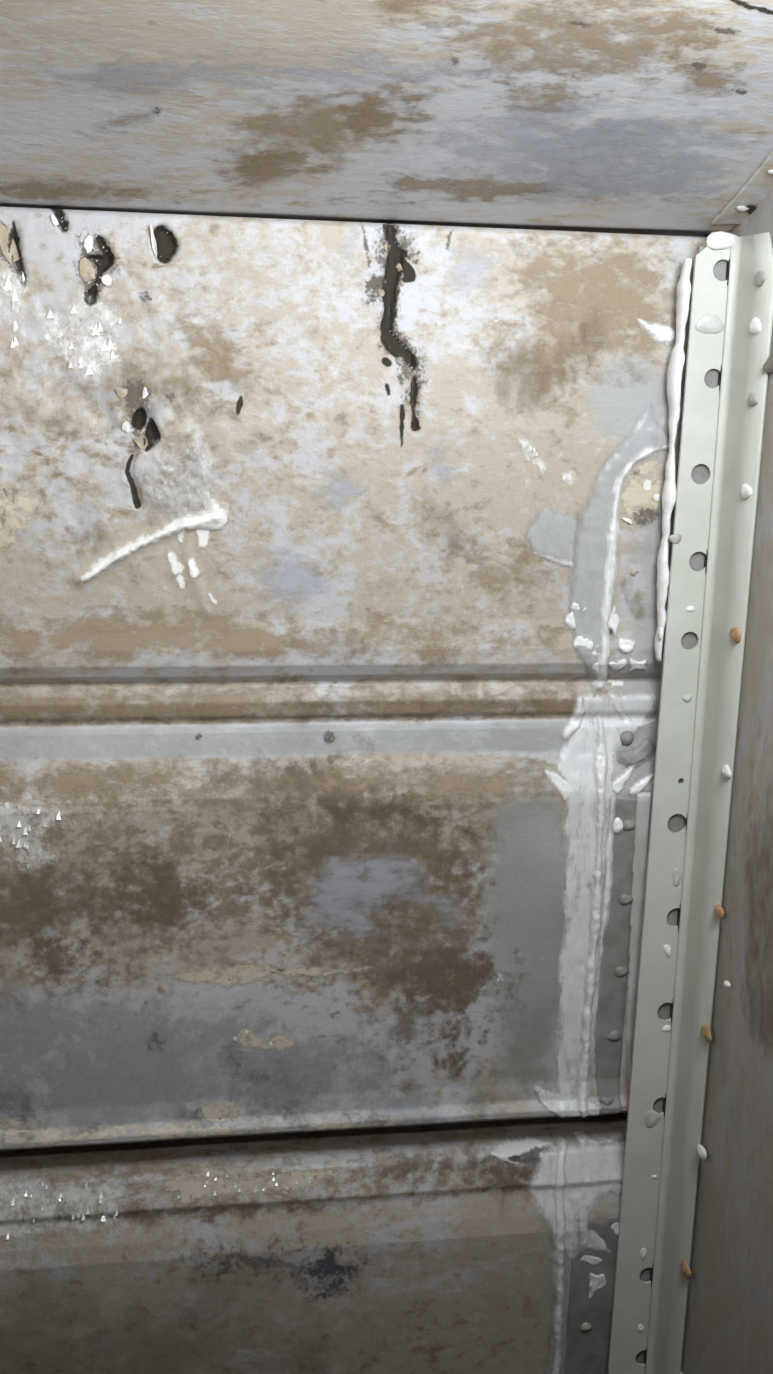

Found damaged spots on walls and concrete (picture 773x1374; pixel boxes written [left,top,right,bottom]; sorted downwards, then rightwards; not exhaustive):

crack [732,0,773,14]
leakage [441,114,738,197]
spalling [49,208,69,232]
spalling [150,224,178,268]
spalling [0,221,28,349]
peeling [46,235,123,379]
crack [362,223,452,446]
peeling [116,387,148,399]
peeling [122,421,148,449]
leakage [167,529,210,589]
leakage [312,856,418,931]
leakage [0,995,437,1147]